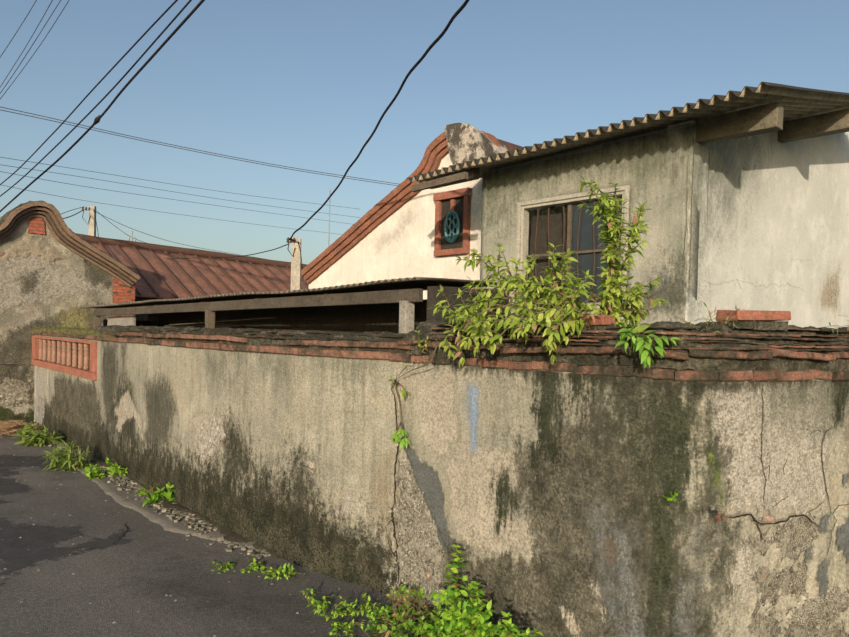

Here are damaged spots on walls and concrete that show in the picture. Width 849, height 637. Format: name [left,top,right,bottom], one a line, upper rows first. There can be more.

spalling [0,377,34,408]
damp [20,271,39,294]
damp [83,259,115,288]
damp [0,303,403,597]
crack [345,365,413,593]
peeling [385,368,534,610]
damp [438,364,849,637]
peeling [708,380,849,637]
crack [726,382,849,554]